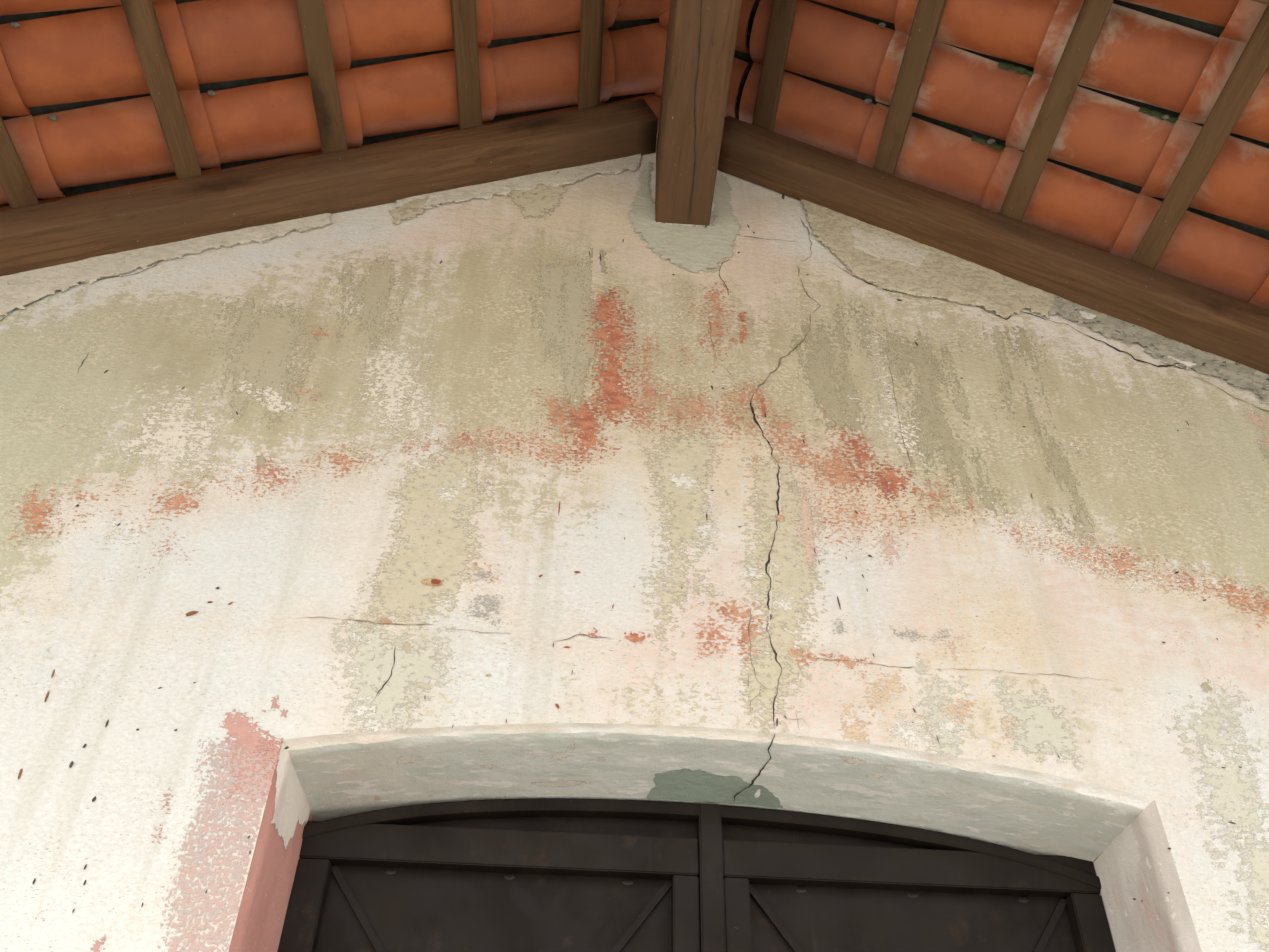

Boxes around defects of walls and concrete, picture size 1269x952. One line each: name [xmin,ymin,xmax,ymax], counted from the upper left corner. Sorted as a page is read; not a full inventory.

crack [0,260,162,321]
damp [209,252,412,429]
damp [517,248,608,405]
rust [6,278,1269,651]
crack [710,220,944,801]
damp [789,298,1008,514]
damp [976,325,1098,554]
crack [976,305,1269,412]
rust [693,597,910,743]
peeling [141,696,310,952]
peeling [647,769,783,808]
peeling [1166,677,1269,952]